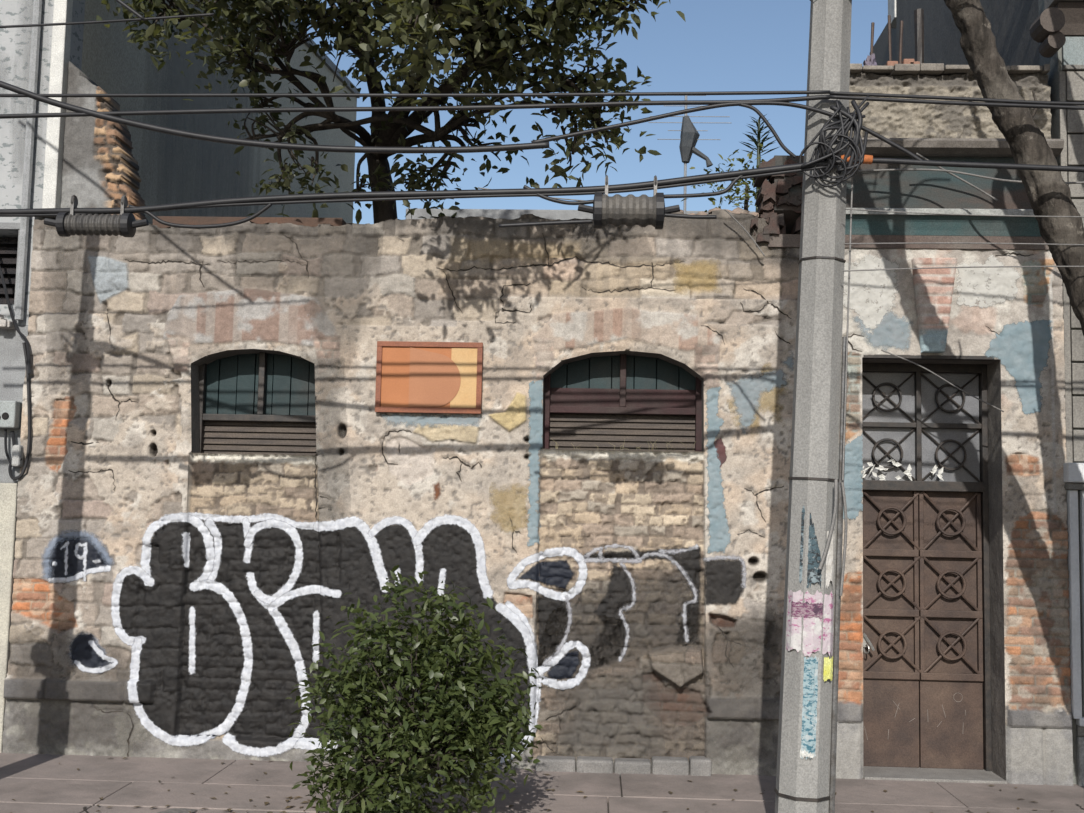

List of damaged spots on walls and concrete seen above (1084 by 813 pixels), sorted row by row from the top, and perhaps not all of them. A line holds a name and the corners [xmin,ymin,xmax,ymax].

crack [438,233,685,324]
peeling [955,255,1054,308]
spalling [45,397,77,472]
crack [68,469,116,491]
crack [108,384,136,416]
peeling [986,320,1052,414]
flaking render [1005,452,1040,476]
spalling [12,578,77,633]
flaking render [833,571,863,705]
flaking render [1004,506,1072,714]